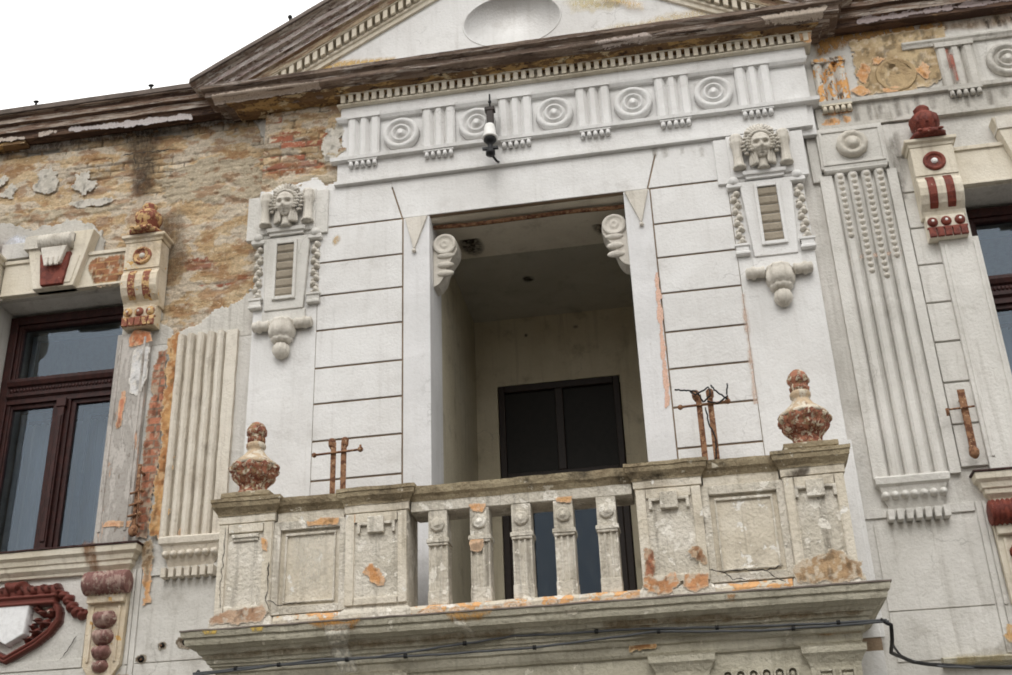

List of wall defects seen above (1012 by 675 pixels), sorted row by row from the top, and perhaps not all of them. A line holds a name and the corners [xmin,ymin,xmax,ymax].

spalling [758,0,1012,96]
peeling [822,108,853,126]
leakage [0,118,265,193]
spalling [0,104,346,606]
peeling [654,272,670,408]
spalling [362,563,385,586]
spalling [570,546,710,603]
spalling [793,548,866,585]
spalling [158,637,190,650]
peeling [417,600,532,632]